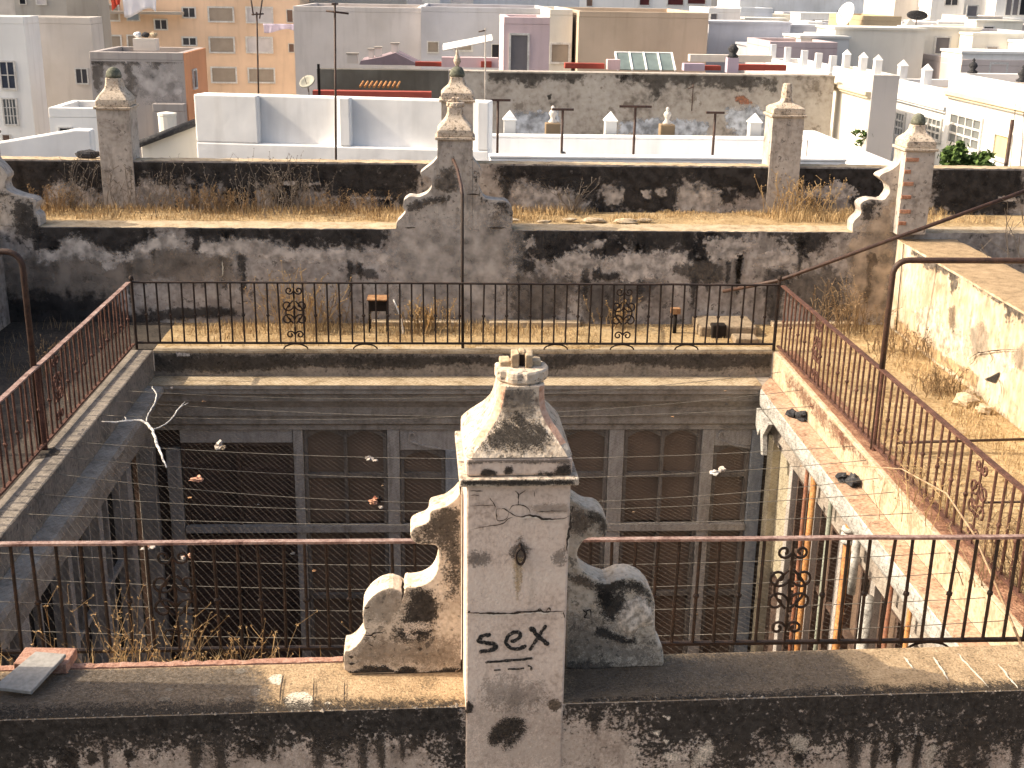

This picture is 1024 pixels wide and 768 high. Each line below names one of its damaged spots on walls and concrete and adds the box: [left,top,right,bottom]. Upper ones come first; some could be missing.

flaking render [725,96,766,136]
damp [473,166,769,217]
damp [508,168,979,389]
damp [461,389,575,486]
crack [471,490,573,554]
damp [392,507,460,651]
damp [568,573,654,645]
damp [0,665,473,768]
damp [548,650,1024,768]